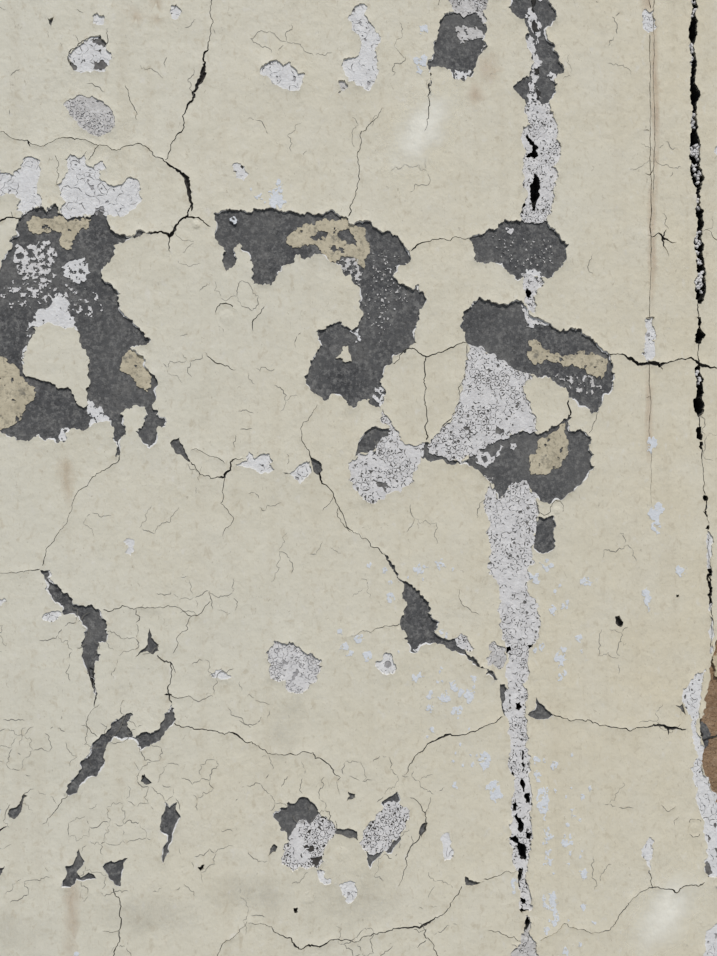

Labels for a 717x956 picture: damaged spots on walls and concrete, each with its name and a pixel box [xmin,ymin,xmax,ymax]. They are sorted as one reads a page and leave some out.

crack [1,0,215,266]
peeling [0,154,167,457]
peeling [170,438,190,462]
crack [188,410,252,533]
crack [287,406,383,554]
peeling [211,0,615,956]
crack [609,342,717,460]
peeling [40,570,108,694]
peeling [66,705,176,796]
crack [0,576,501,956]
crack [554,704,686,735]
peeling [676,640,717,889]